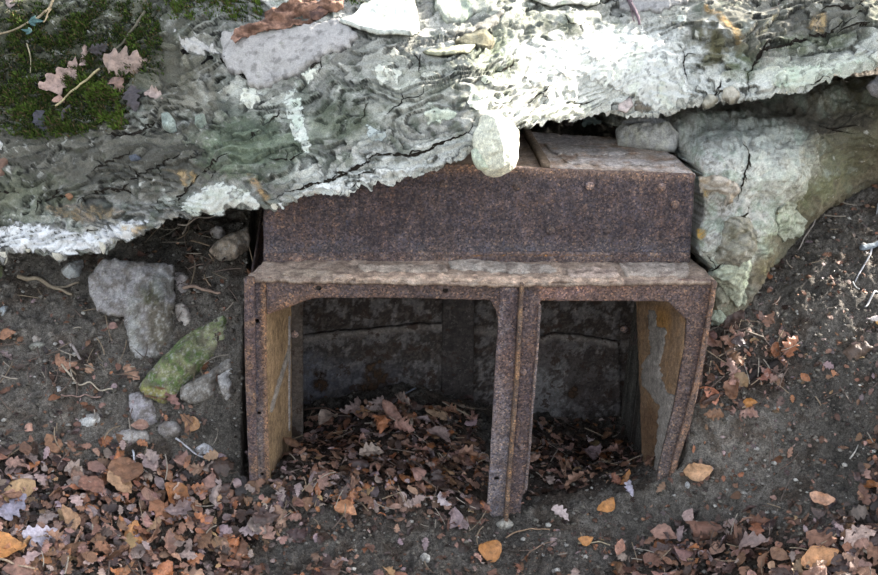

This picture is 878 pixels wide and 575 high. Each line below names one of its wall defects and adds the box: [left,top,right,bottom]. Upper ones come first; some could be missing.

crack [747,0,878,92]
crack [0,122,180,210]
crack [168,153,227,206]